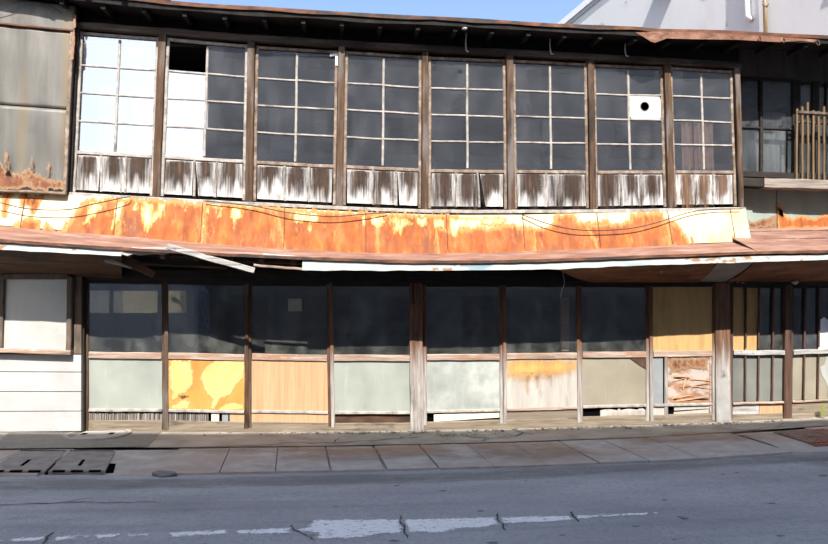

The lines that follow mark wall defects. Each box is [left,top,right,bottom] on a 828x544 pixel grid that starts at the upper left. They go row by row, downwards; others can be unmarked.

water stain [257,166,334,203]
corrosion [0,153,694,254]
water stain [350,170,420,204]
water stain [432,173,503,210]
water stain [518,174,586,210]
water stain [600,174,661,209]
peeling [169,359,244,410]